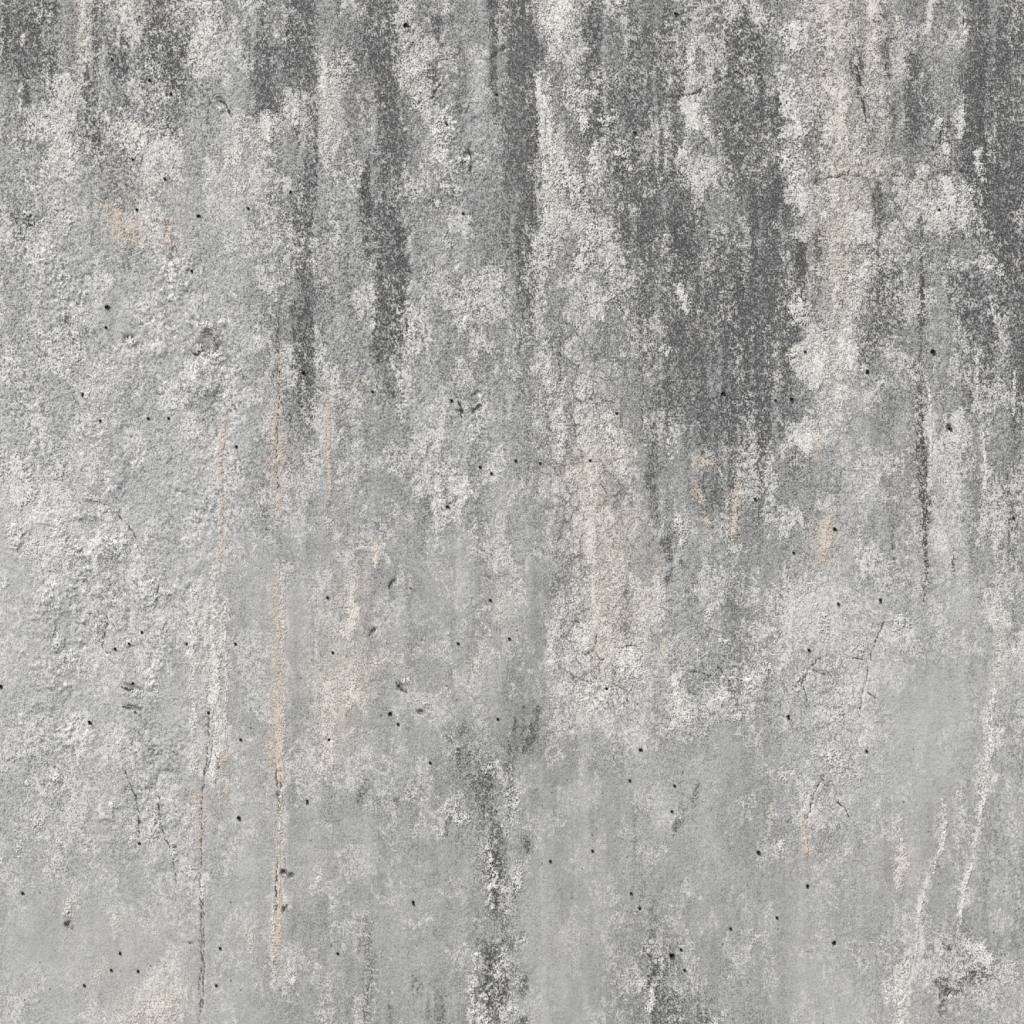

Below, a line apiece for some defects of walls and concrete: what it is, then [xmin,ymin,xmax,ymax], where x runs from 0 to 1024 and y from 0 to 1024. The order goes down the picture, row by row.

water stain [222,0,412,419]
water stain [487,0,903,517]
water stain [892,0,1024,428]
crack [124,714,220,1024]
crack [274,769,282,809]
water stain [482,940,528,1019]
water stain [504,706,540,771]
crack [795,621,885,716]